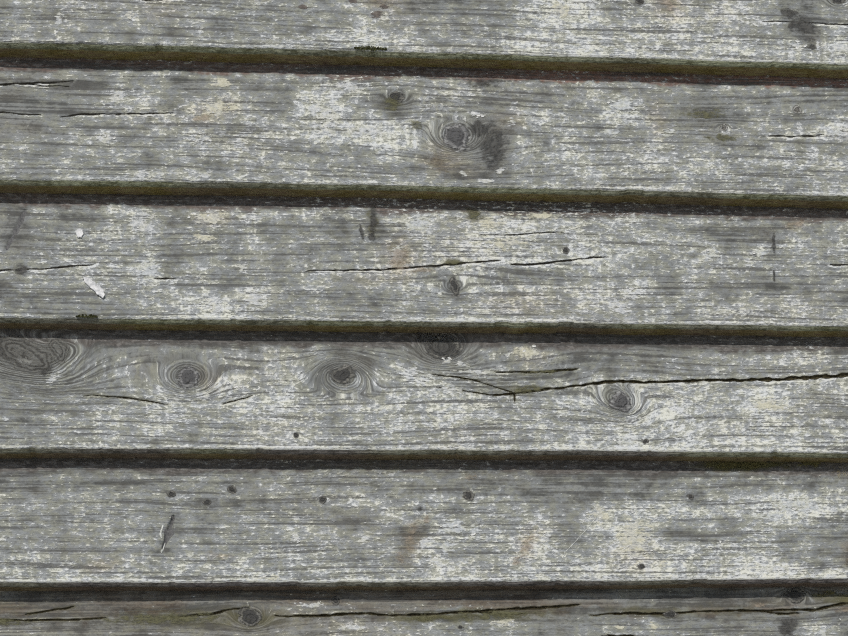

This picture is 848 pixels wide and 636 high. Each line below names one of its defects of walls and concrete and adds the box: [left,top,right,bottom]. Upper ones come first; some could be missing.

crack [0,80,69,88]
crack [62,111,165,119]
crack [489,229,558,237]
crack [0,264,90,272]
crack [305,256,602,272]
crack [433,368,848,402]
crack [0,606,106,621]
crack [182,607,248,617]
crack [275,602,848,636]